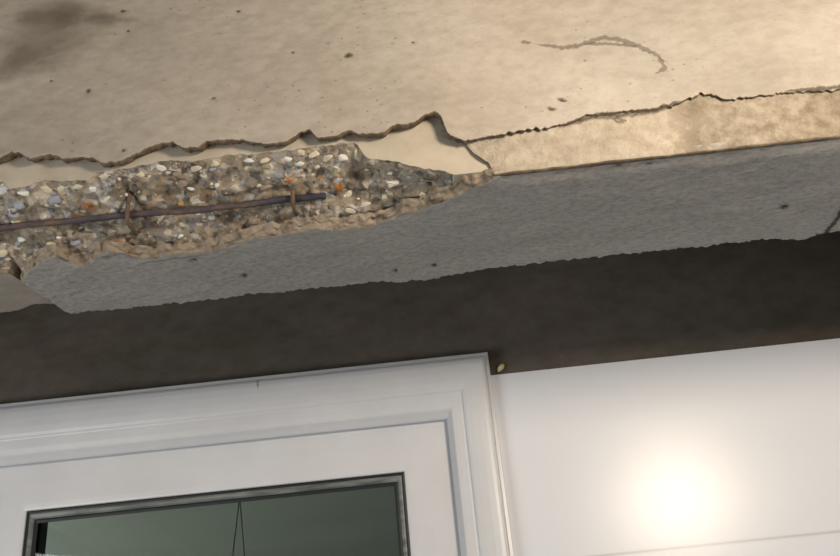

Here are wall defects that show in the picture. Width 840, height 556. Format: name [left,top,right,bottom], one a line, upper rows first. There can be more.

spalling [0,143,452,277]
crack [816,207,840,238]